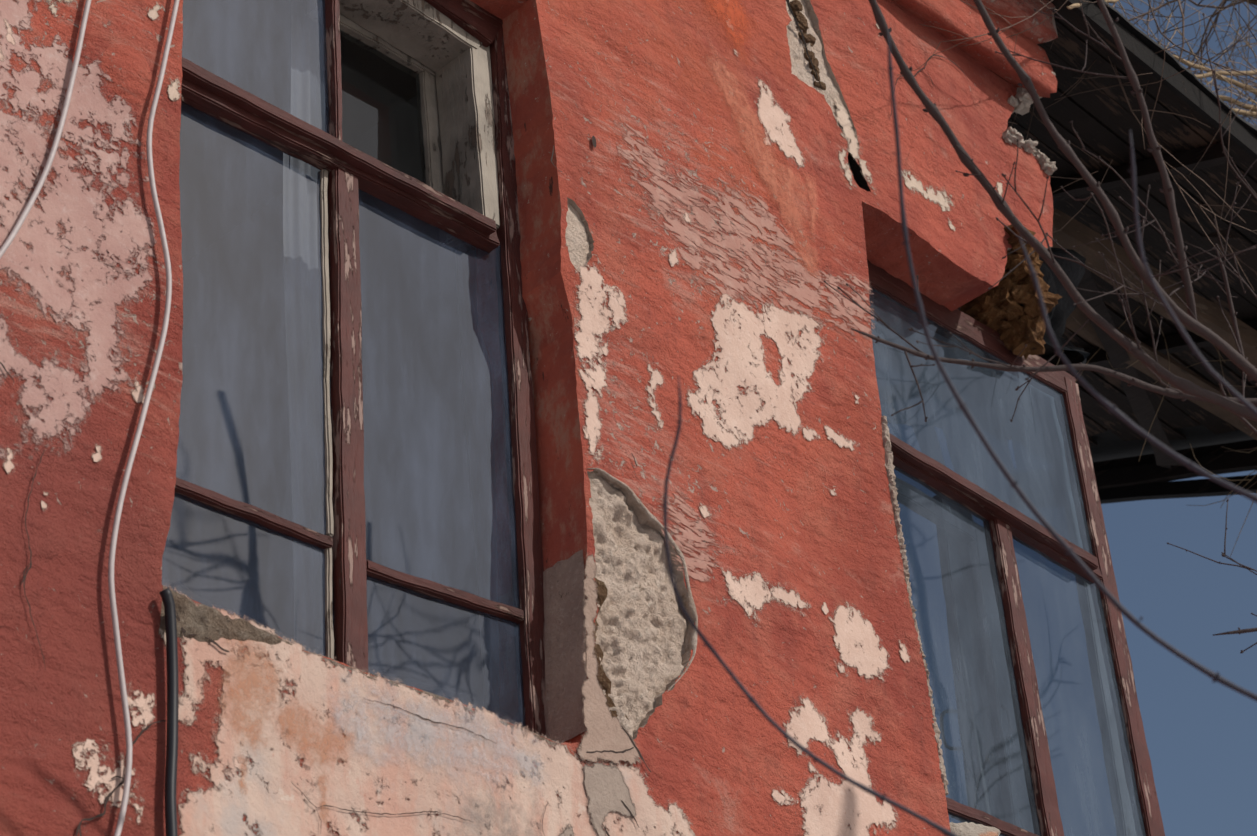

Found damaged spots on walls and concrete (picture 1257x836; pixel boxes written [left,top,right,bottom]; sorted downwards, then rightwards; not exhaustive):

peeling [148,2,162,20]
peeling [167,79,180,101]
peeling [757,77,804,167]
peeling [830,93,874,189]
peeling [0,0,157,474]
peeling [614,120,875,450]
flaking render [159,203,949,836]
peeling [72,739,144,825]